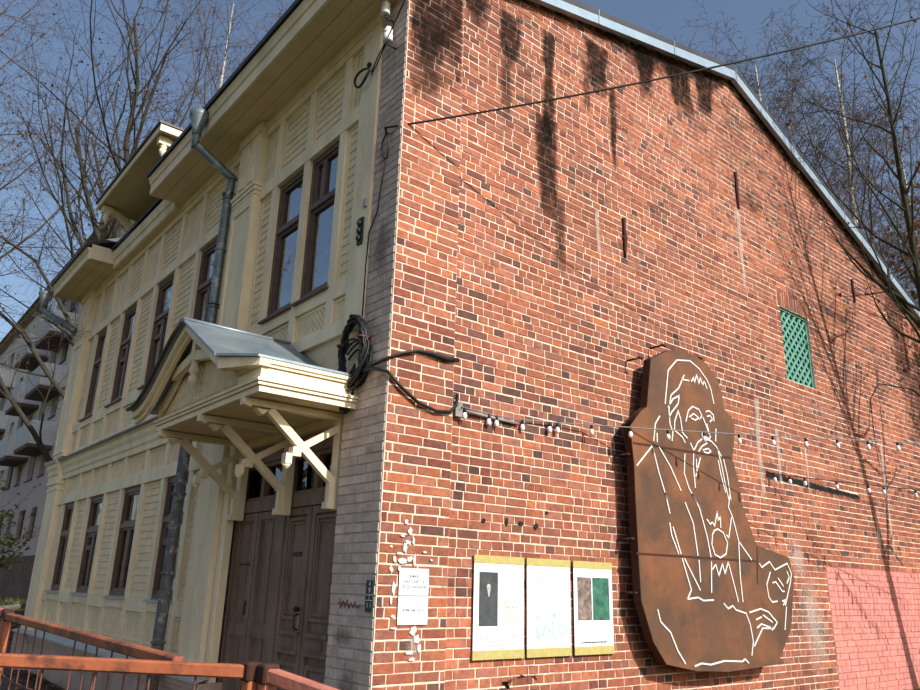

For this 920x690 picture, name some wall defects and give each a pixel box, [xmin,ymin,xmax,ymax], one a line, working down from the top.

damp [412,0,488,92]
damp [500,10,521,111]
damp [536,31,565,261]
damp [585,30,723,167]